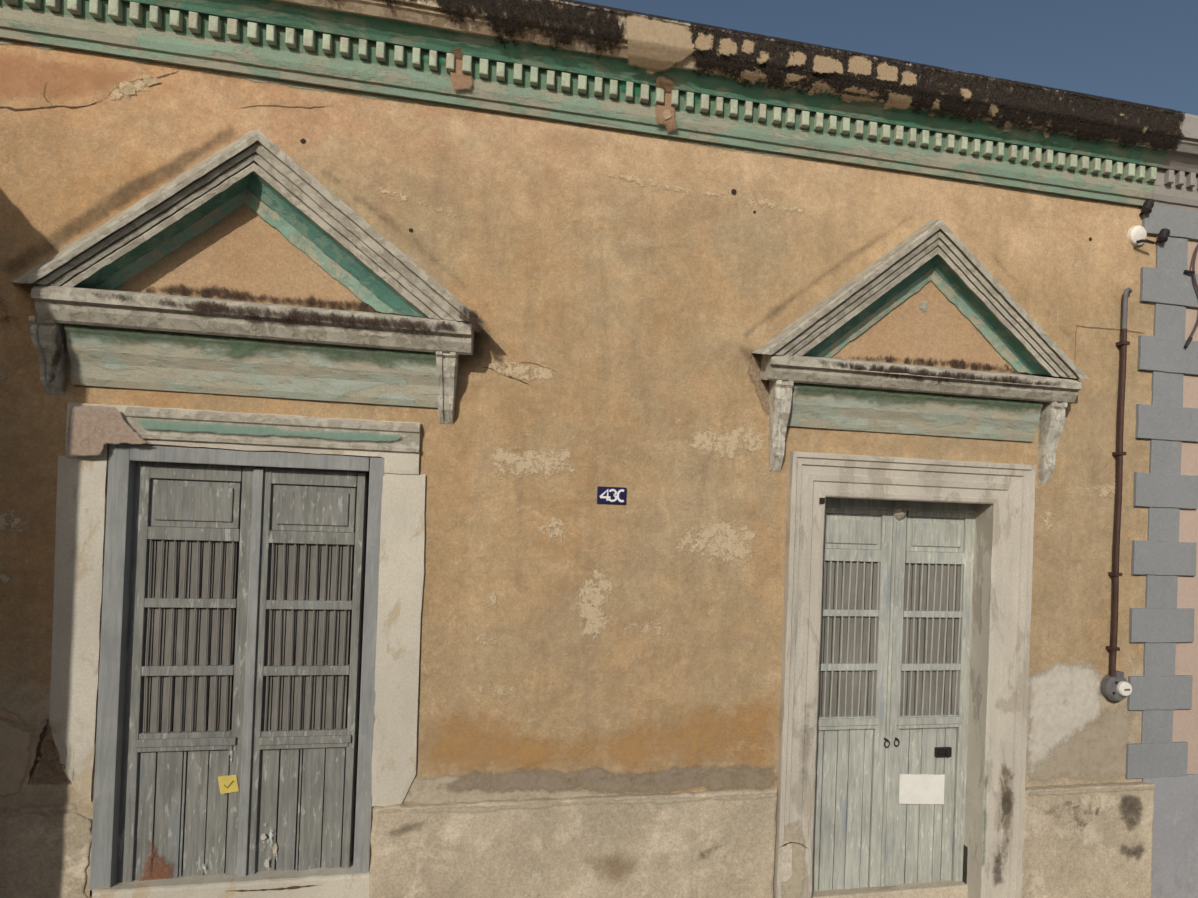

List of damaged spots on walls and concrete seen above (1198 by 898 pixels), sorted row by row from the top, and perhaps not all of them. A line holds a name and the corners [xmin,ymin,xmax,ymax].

crack [0,68,182,111]
crack [242,102,330,110]
spalling [450,47,472,90]
peeling [626,14,696,132]
peeling [486,445,575,479]
peeling [676,518,768,565]
peeling [571,566,613,641]
spalling [28,719,70,784]
damp [1120,796,1142,827]
rust [140,844,176,881]